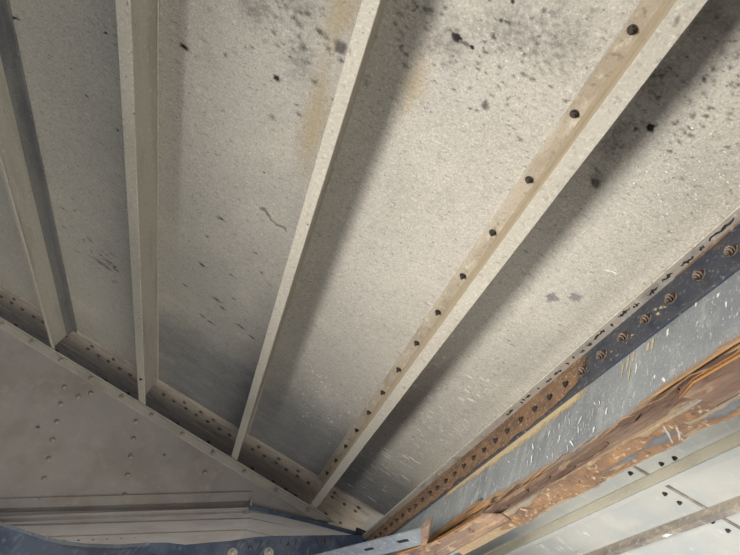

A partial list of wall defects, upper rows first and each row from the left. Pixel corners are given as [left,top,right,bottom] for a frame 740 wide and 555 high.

peeling [681,218,734,266]
peeling [520,303,639,403]
rust [367,356,586,541]
peeling [536,443,608,486]
rust [428,337,740,541]
peeling [618,404,653,427]
peeling [493,489,528,513]